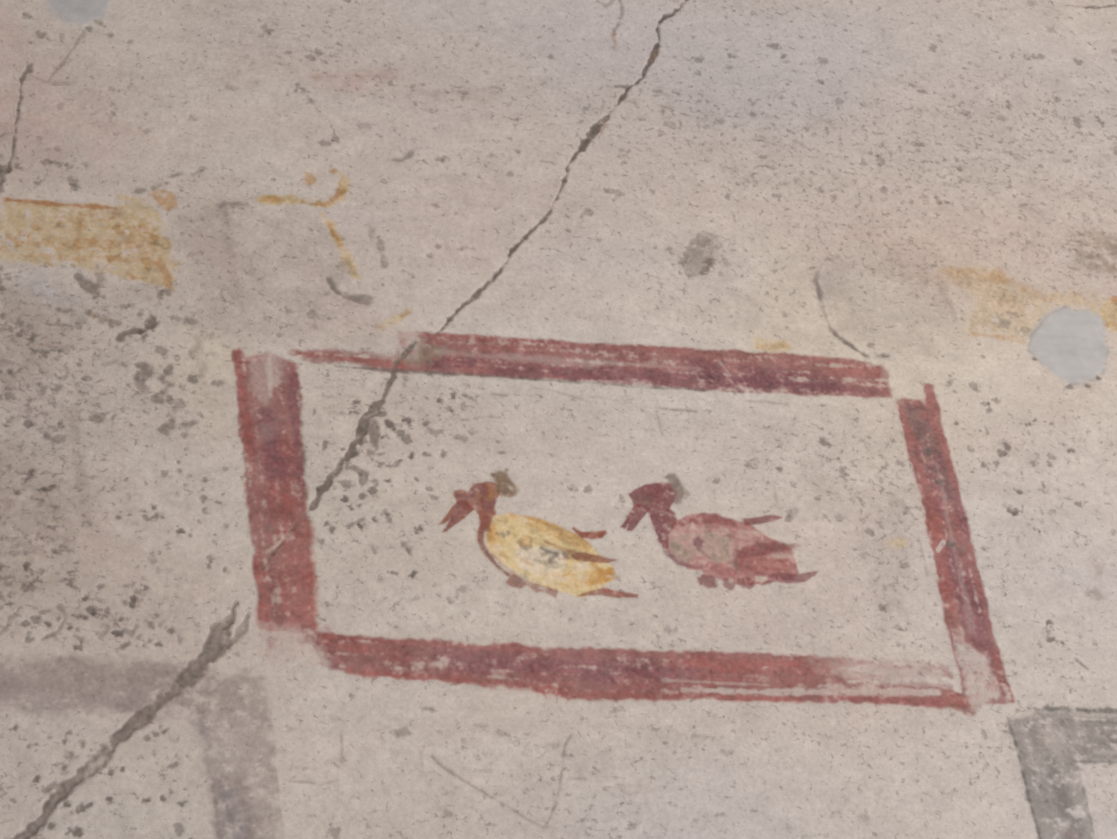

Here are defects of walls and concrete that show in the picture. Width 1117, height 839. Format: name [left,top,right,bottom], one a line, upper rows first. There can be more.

crack [0,28,88,174]
crack [257,0,690,571]
spalling [1062,374,1104,391]
crack [1,599,252,839]